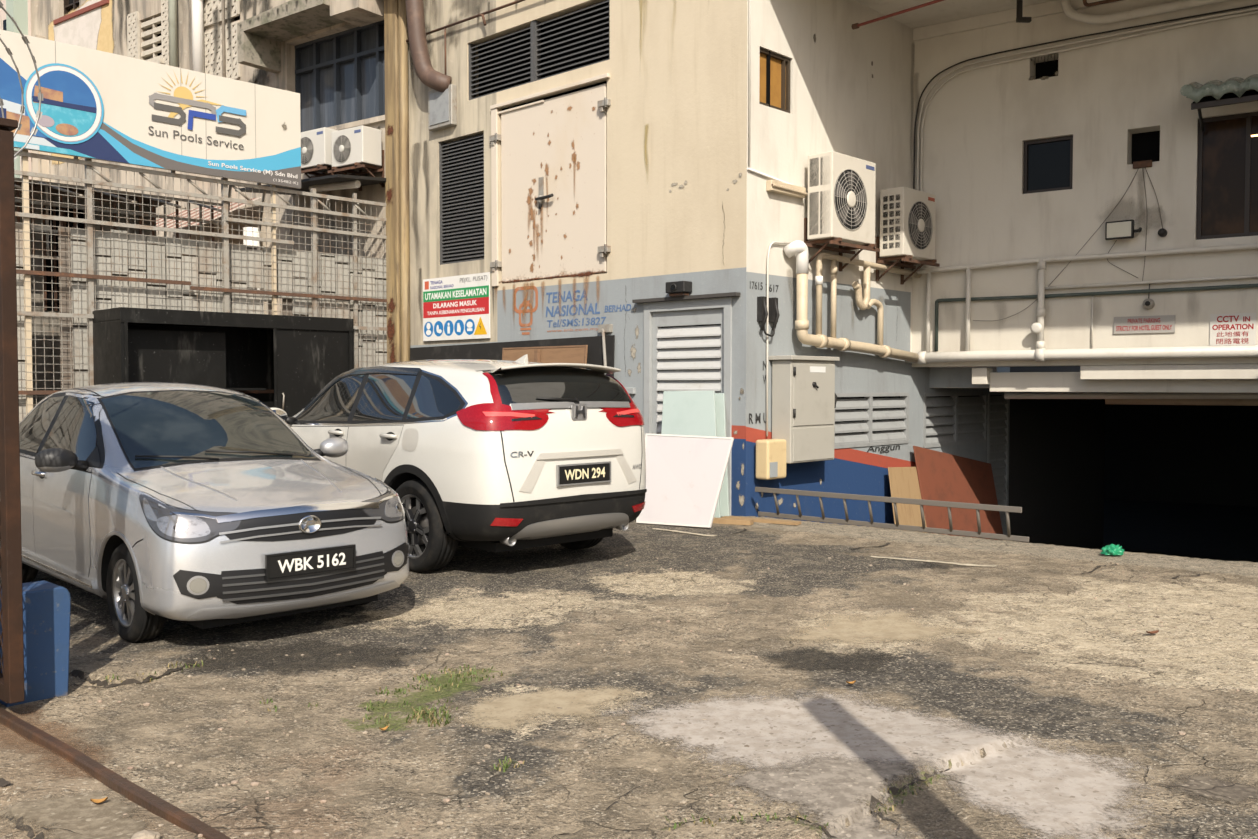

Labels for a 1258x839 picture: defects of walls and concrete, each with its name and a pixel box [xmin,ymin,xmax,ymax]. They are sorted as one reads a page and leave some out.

rust [499,141,605,283]
crack [69,661,194,688]
crack [0,778,79,839]